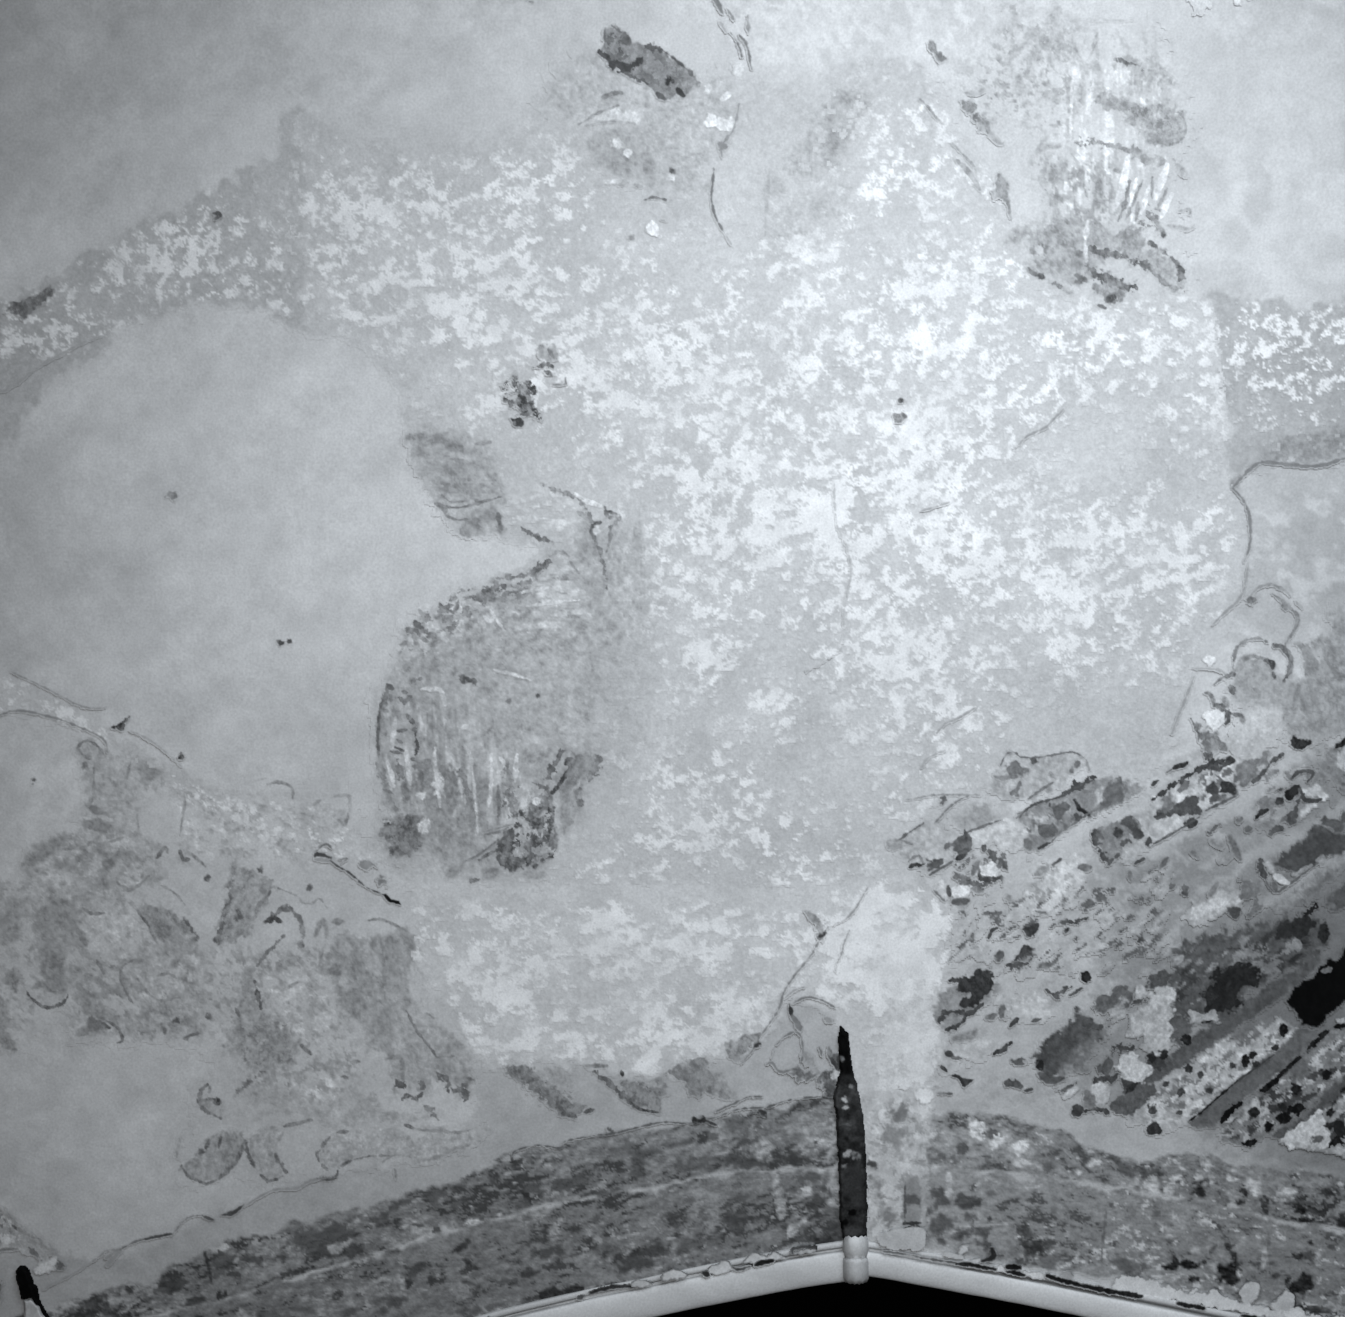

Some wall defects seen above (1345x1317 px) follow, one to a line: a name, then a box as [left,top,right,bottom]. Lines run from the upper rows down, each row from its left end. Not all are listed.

spalling [596,23,703,102]
damp [926,39,950,65]
damp [958,86,1006,147]
damp [990,171,1013,220]
peeling [0,100,313,458]
damp [500,341,568,428]
damp [892,396,908,424]
peeling [285,48,1345,1108]
crack [1211,456,1345,626]
crack [1169,666,1228,736]
peeling [0,668,303,850]
damp [866,1100,930,1233]